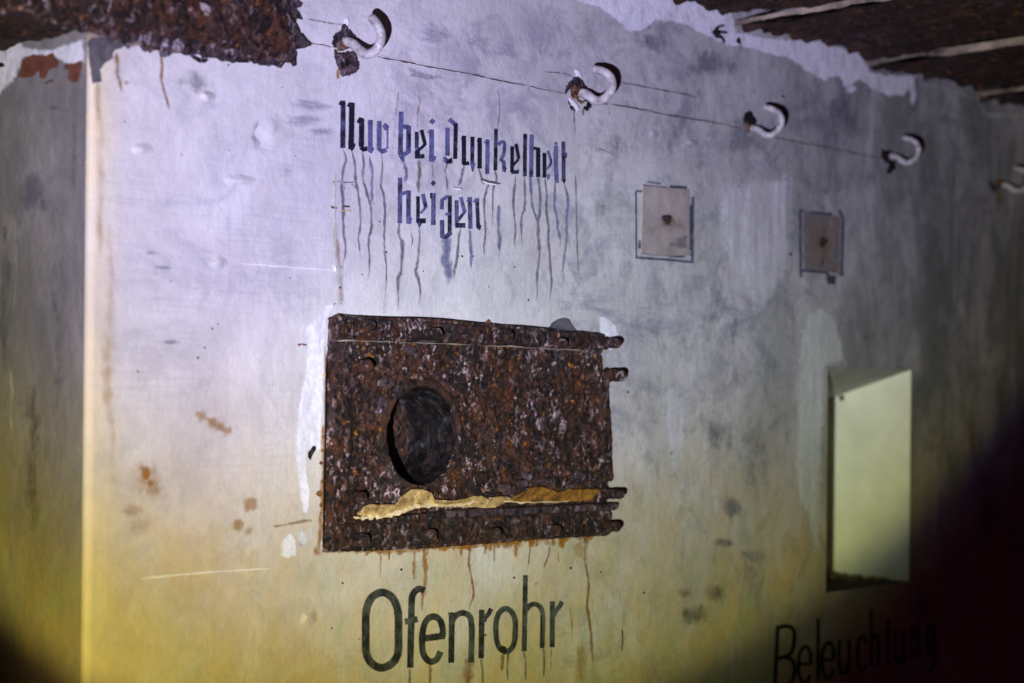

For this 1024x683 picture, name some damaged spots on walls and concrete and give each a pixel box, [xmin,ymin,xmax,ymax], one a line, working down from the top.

peeling [18,32,125,84]
rust [77,0,311,107]
rust [372,376,395,415]
rust [536,416,548,430]
rust [314,426,326,554]
rust [475,471,583,495]
rust [342,537,593,676]